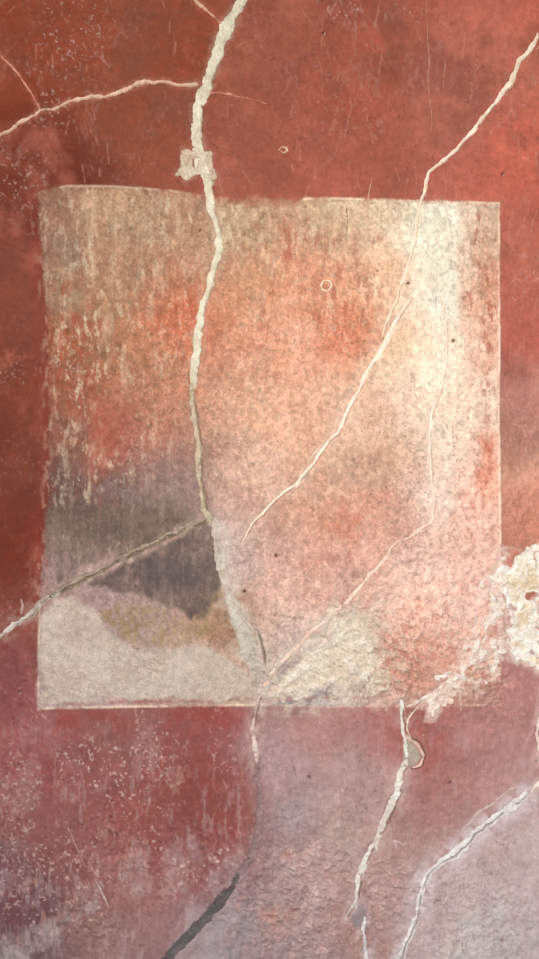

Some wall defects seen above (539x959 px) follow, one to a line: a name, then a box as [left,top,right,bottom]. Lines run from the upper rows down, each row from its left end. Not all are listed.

crack [0,0,277,959]
crack [281,281,449,662]
crack [241,33,539,545]
flaking render [407,539,539,718]
crack [345,693,438,959]
crack [395,716,539,959]